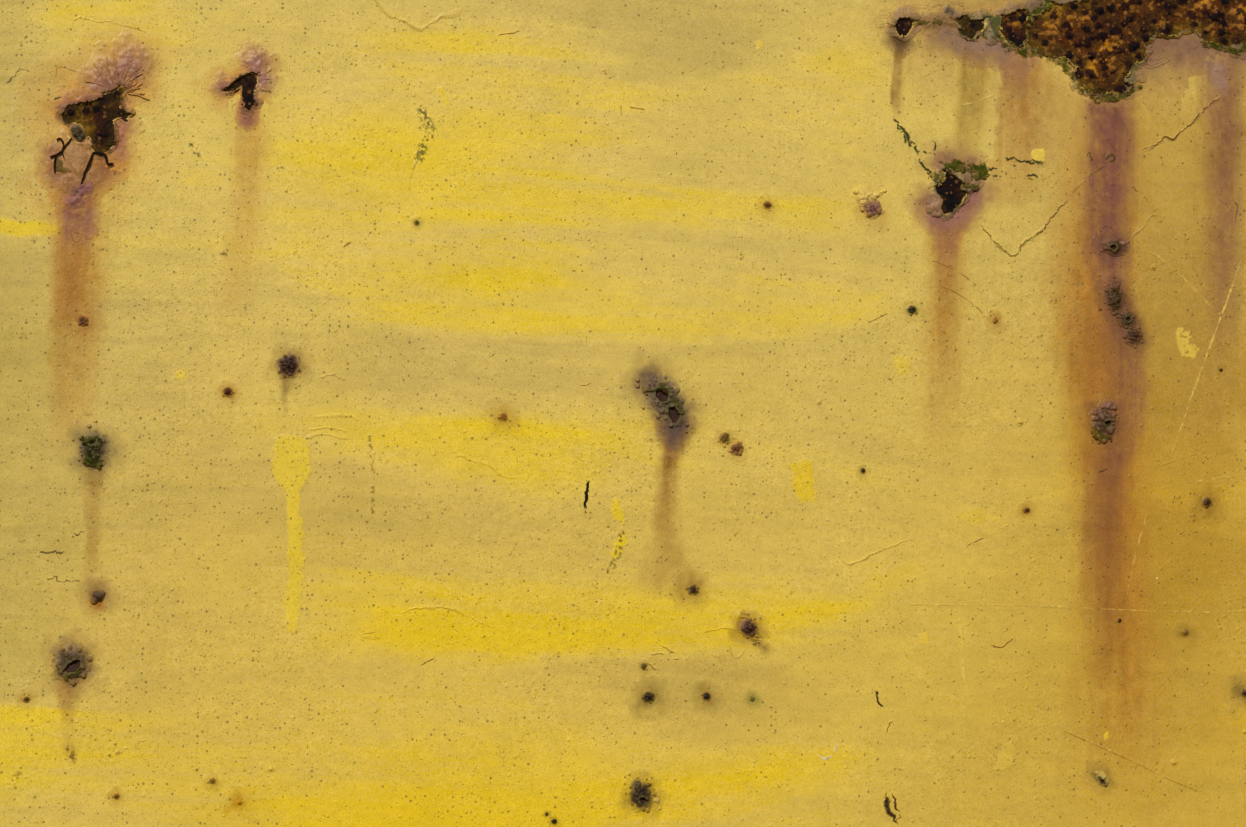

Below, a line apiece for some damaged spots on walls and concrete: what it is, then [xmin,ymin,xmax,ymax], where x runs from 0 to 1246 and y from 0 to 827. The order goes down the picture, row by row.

corrosion [210,94,277,338]
peeling [858,0,1246,134]
crack [980,97,1220,256]
corrosion [12,174,144,767]
corrosion [612,345,750,615]
corrosion [899,54,1246,820]
corrosion [726,605,776,660]
corrosion [613,763,672,824]